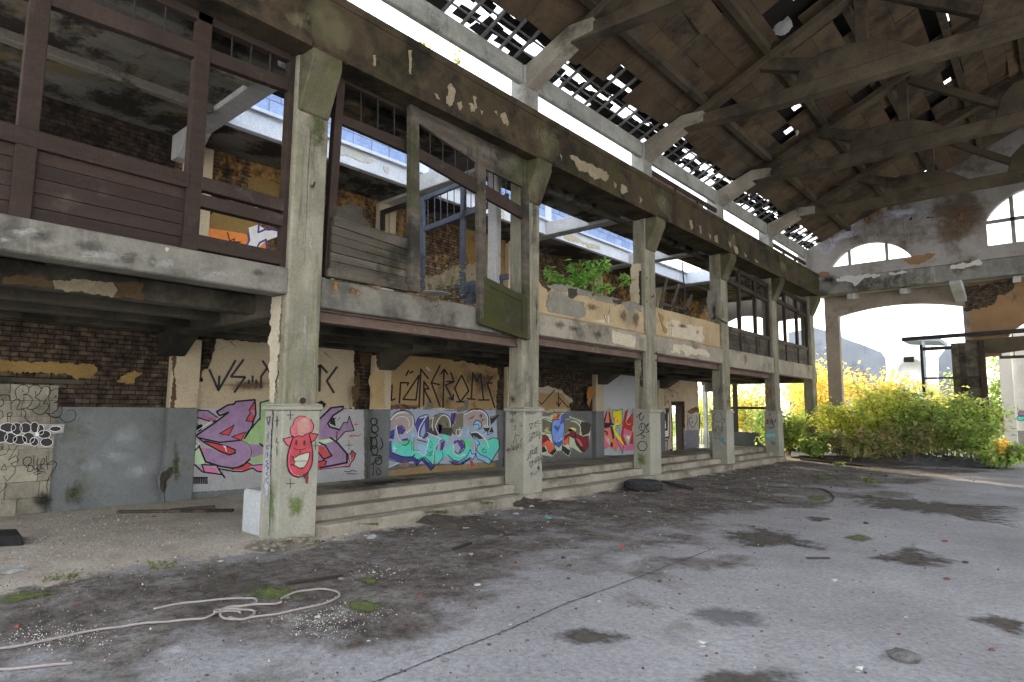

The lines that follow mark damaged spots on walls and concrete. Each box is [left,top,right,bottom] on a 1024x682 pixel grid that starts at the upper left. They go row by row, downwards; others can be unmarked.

peeling [434,83,509,126]
peeling [560,154,642,203]
peeling [2,274,53,288]
peeling [114,281,144,300]
peeling [817,253,936,286]
peeling [950,259,982,269]
flaking render [963,281,1015,312]
spalling [268,295,283,403]
peeling [665,320,710,358]
spalling [158,467,173,492]